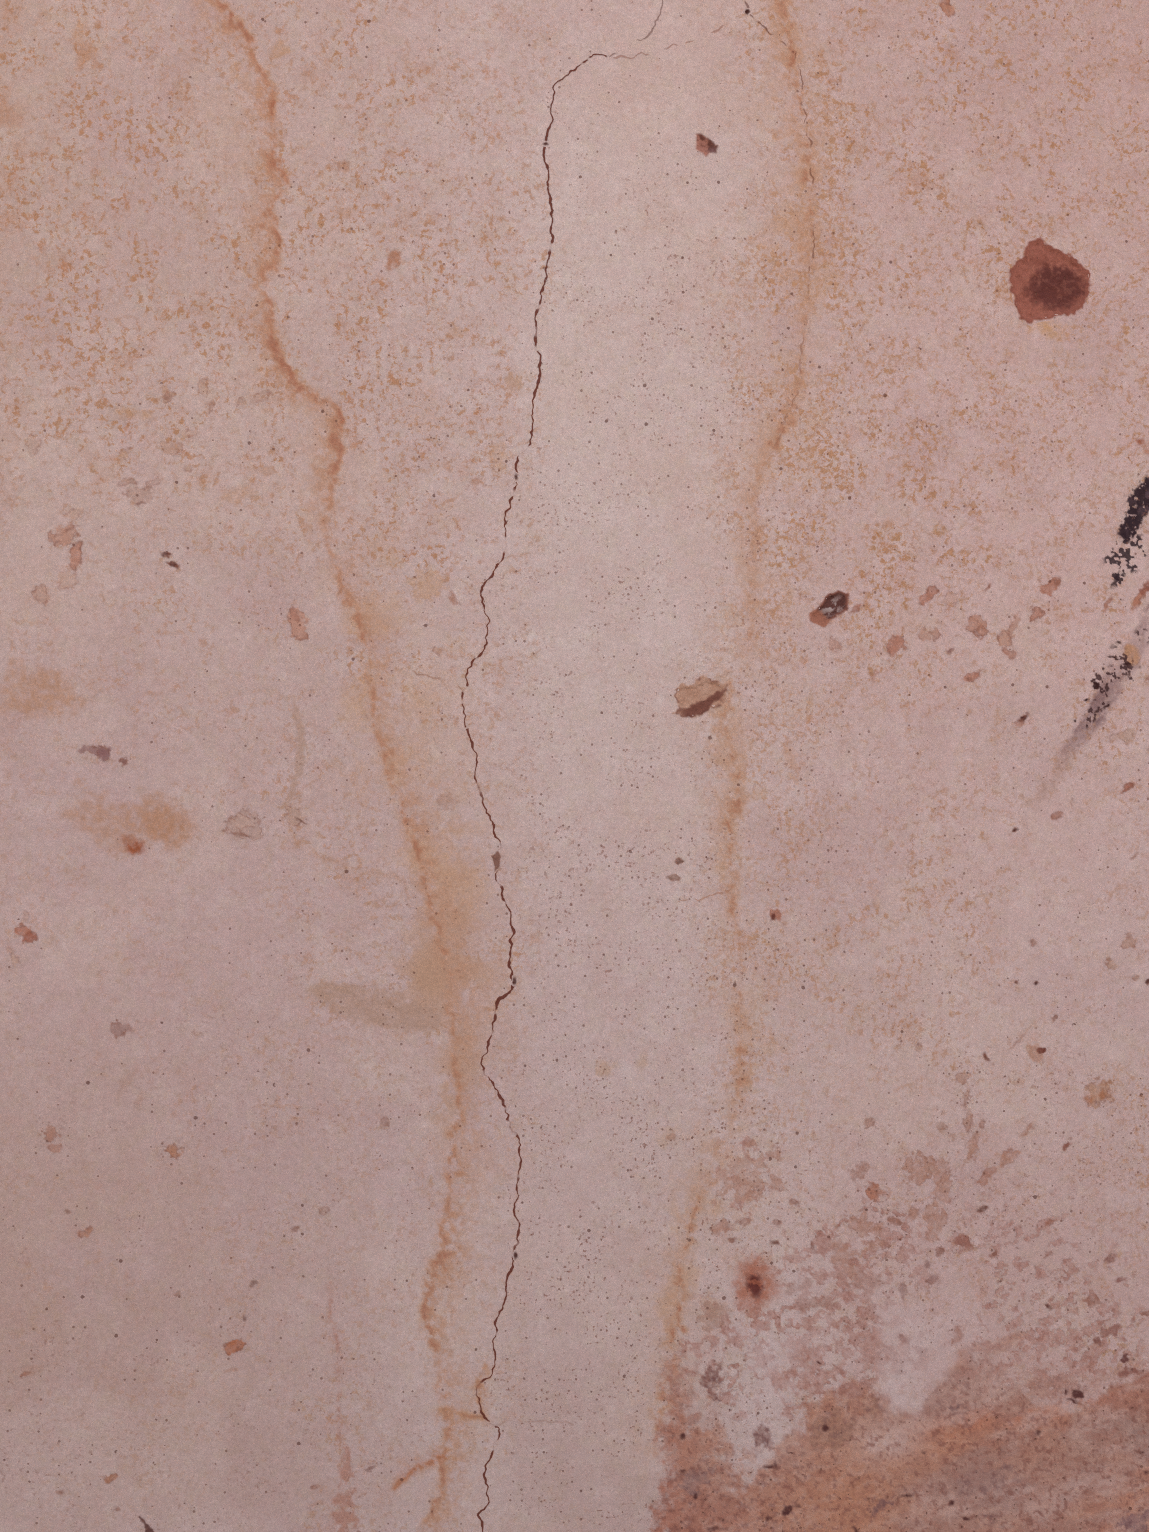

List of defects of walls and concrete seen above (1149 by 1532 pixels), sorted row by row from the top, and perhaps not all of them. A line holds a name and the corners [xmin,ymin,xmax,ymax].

damp [0,0,61,296]
flaking render [689,128,724,163]
damp [1100,438,1149,594]
damp [130,0,543,1532]
crack [408,0,816,1532]
flaking render [666,668,737,724]
damp [597,0,874,1502]
spalling [803,583,865,652]
peeling [869,575,1062,683]